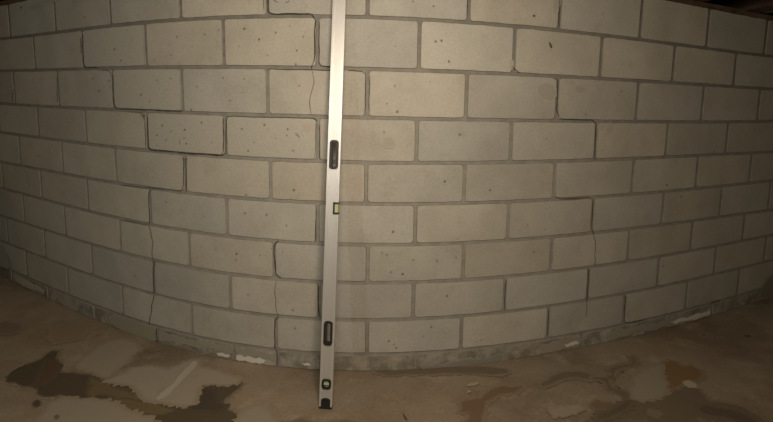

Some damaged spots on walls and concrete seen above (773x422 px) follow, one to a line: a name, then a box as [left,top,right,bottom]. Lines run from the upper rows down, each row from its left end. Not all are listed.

crack [263,0,370,159]
crack [552,78,596,160]
crack [82,34,291,342]
crack [273,240,281,365]
leakage [4,332,372,422]
leakage [536,354,770,422]